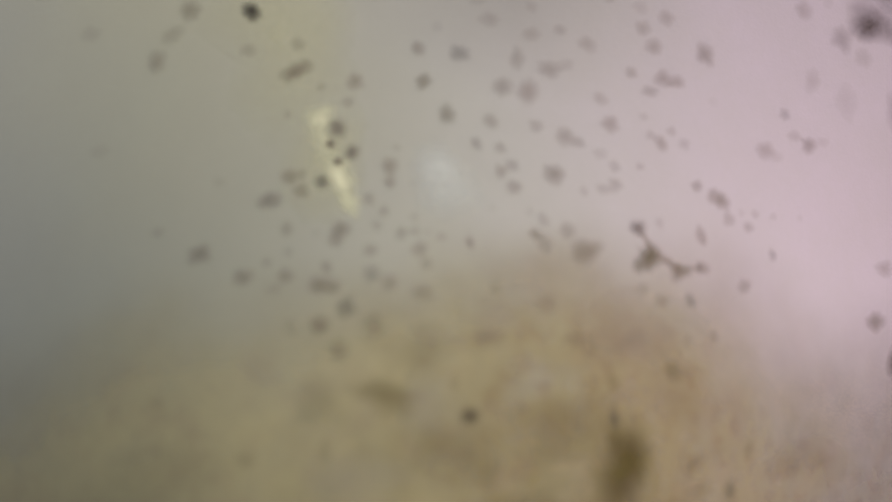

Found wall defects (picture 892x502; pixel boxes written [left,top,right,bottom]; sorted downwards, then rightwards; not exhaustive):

water stain [329,159,354,205]
water stain [0,306,892,502]